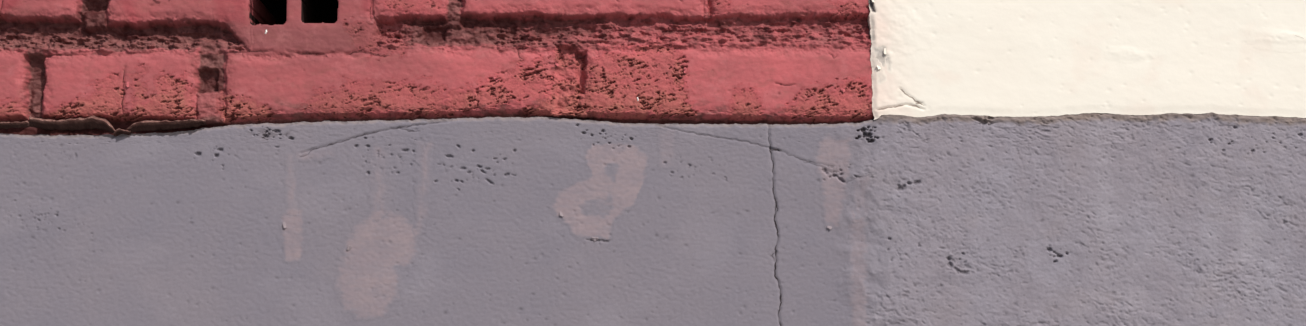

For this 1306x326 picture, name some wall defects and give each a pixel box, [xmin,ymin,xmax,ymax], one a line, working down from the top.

spalling [343,0,450,61]
spalling [0,60,296,143]
spalling [298,38,701,121]
peeling [548,142,652,242]
crack [769,145,782,326]